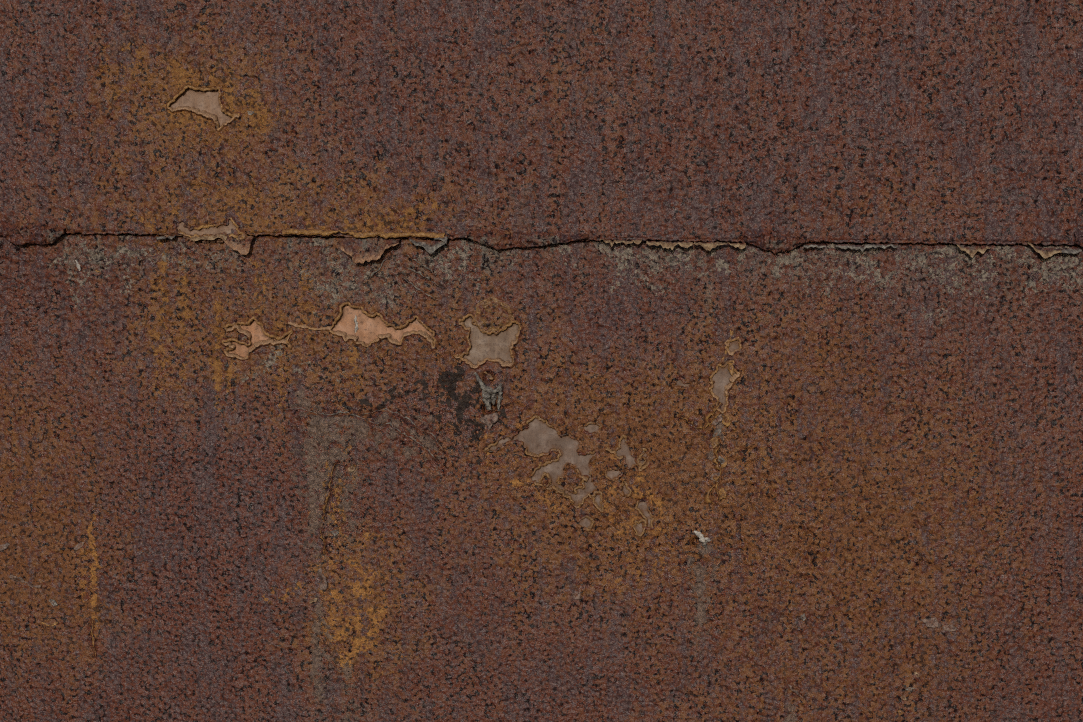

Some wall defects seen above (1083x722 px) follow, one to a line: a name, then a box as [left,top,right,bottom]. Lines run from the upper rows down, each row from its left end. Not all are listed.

peeling [166,84,254,132]
peeling [164,216,247,242]
corrosion [600,238,746,251]
corrosion [803,243,898,252]
corrosion [956,243,992,258]
corrosion [1027,241,1082,259]
corrosion [120,157,466,439]
peeling [219,301,440,361]
peeling [453,297,524,380]
peeling [480,413,655,537]
corrosion [71,514,102,637]
corrosion [262,445,425,683]